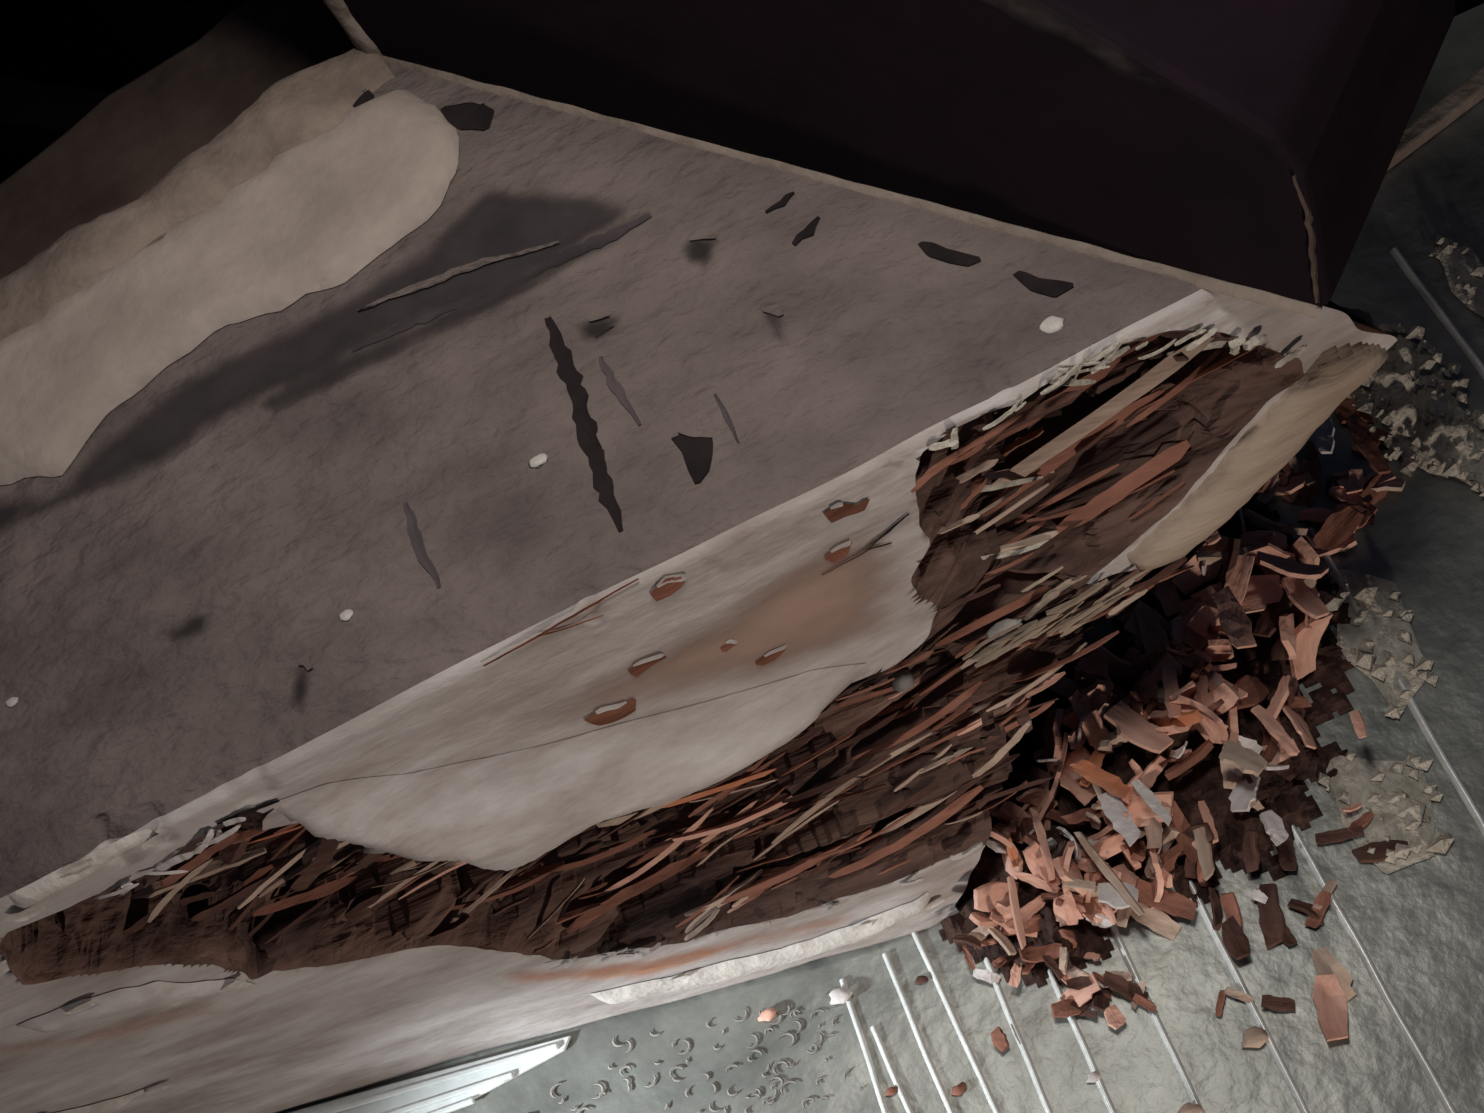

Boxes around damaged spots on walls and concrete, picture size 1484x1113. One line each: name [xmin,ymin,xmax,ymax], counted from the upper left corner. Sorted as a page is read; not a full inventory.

damp [0,195,618,527]
crack [544,316,641,532]
crack [403,502,440,588]
crack [483,578,639,666]
spalling [0,328,1307,1033]